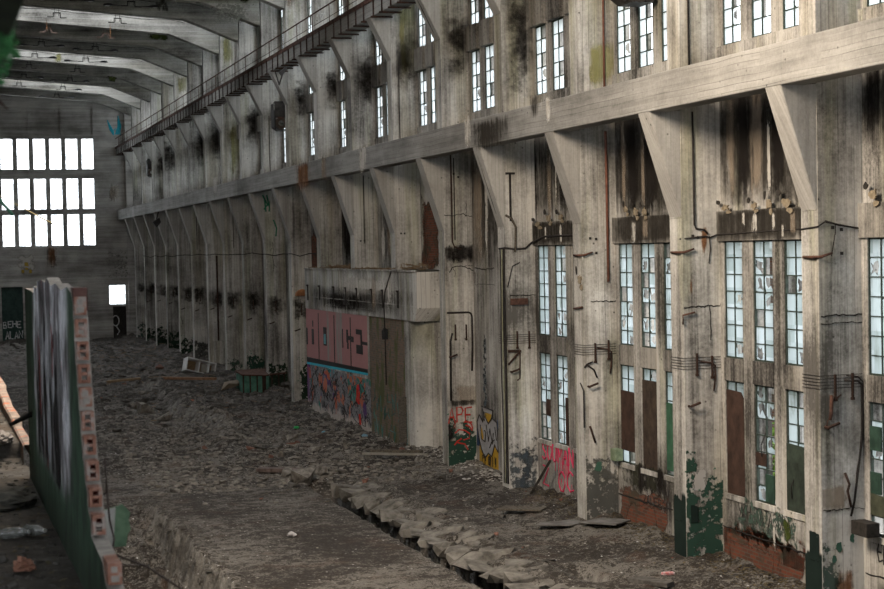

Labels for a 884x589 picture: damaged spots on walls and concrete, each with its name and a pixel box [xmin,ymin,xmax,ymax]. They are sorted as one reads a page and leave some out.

flaking render [421,197,439,270]
peeling [586,451,855,589]